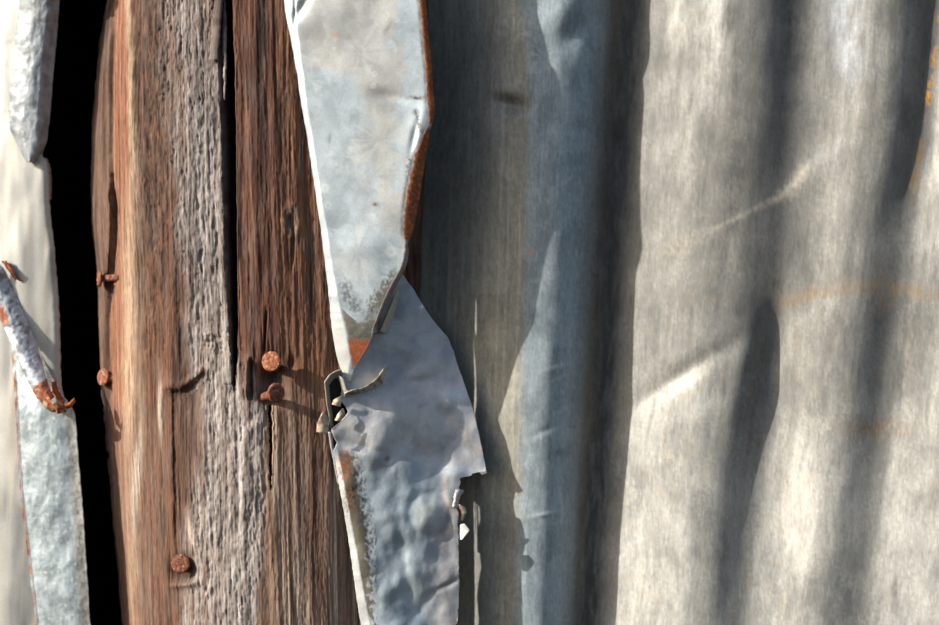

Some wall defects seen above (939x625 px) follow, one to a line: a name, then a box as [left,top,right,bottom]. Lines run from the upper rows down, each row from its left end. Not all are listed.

rust [31,377,54,403]
crack [212,0,274,491]
peeling [334,264,401,369]
rust [345,0,435,368]
peeling [345,449,379,625]